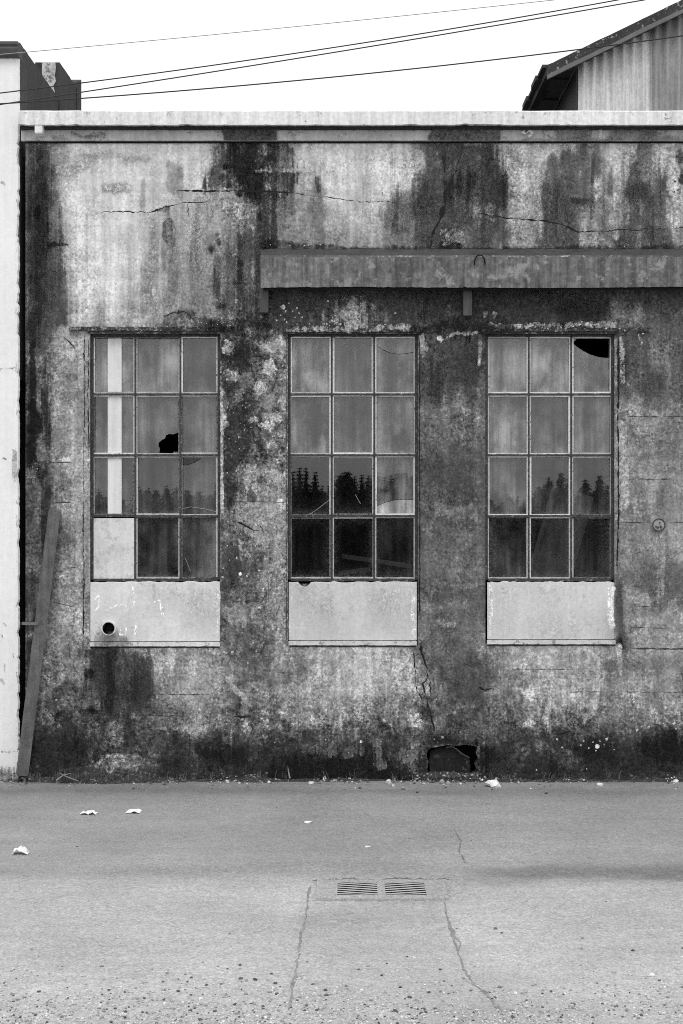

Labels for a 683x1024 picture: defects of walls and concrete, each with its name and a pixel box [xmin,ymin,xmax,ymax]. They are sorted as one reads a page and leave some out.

crack [103,188,404,215]
crack [479,213,683,234]
leakage [26,143,150,558]
leakage [140,129,683,589]
leakage [26,571,36,686]
leakage [0,647,154,782]
peeling [304,743,362,759]
leakage [150,581,683,781]
crack [393,643,472,737]
spalling [398,740,482,773]